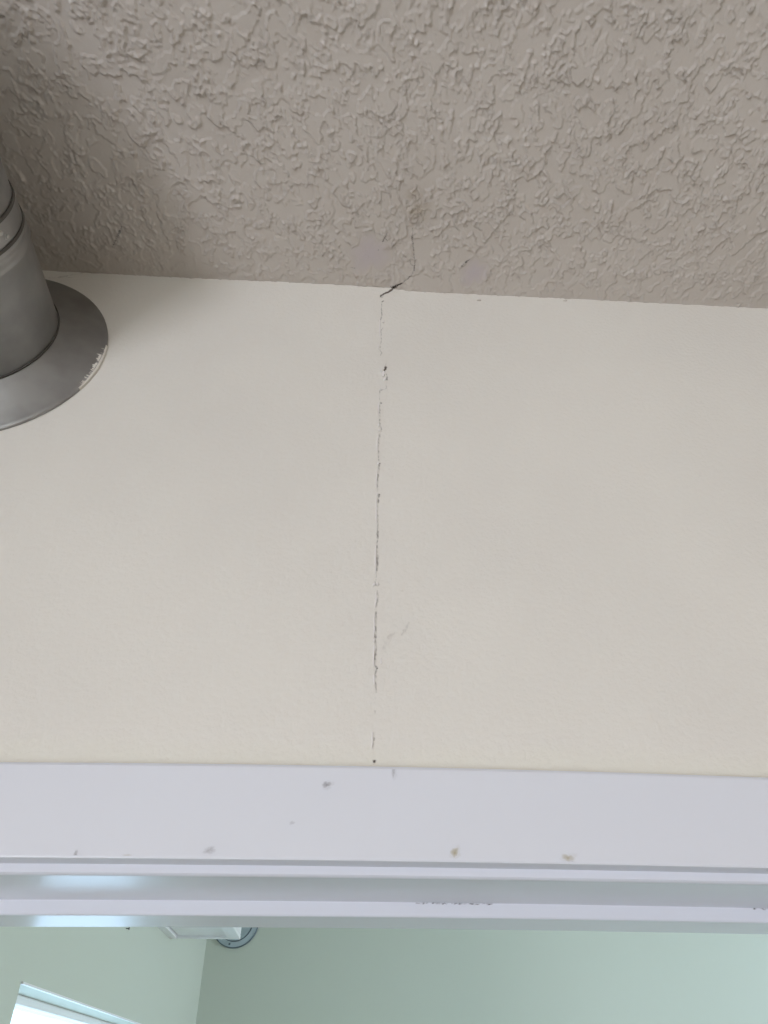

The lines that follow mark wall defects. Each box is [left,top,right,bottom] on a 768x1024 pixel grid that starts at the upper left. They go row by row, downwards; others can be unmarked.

crack [373,276,410,684]